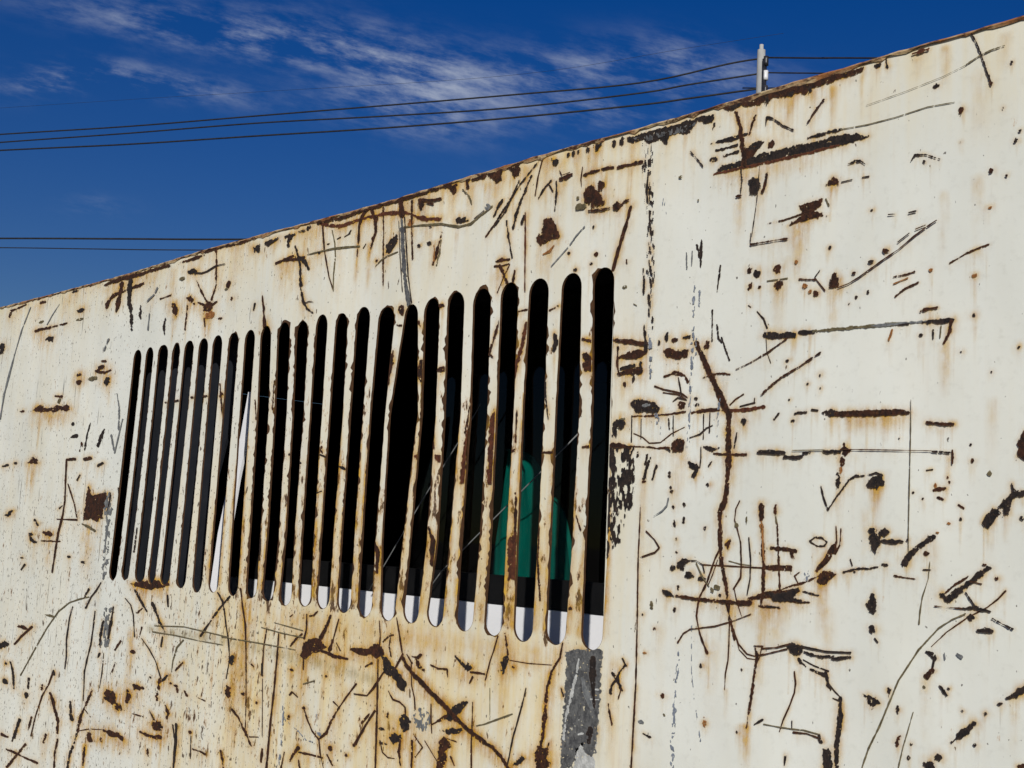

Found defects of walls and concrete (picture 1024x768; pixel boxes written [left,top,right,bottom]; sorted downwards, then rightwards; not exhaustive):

corrosion [575,181,629,212]
corrosion [735,166,768,235]
corrosion [275,209,378,270]
corrosion [536,218,561,255]
corrosion [140,240,250,330]
corrosion [494,257,516,293]
corrosion [767,264,788,290]
corrosion [51,456,108,573]
peeling [606,398,842,609]
corrosion [662,589,754,606]
corrosion [290,614,384,768]
peeling [560,649,603,768]